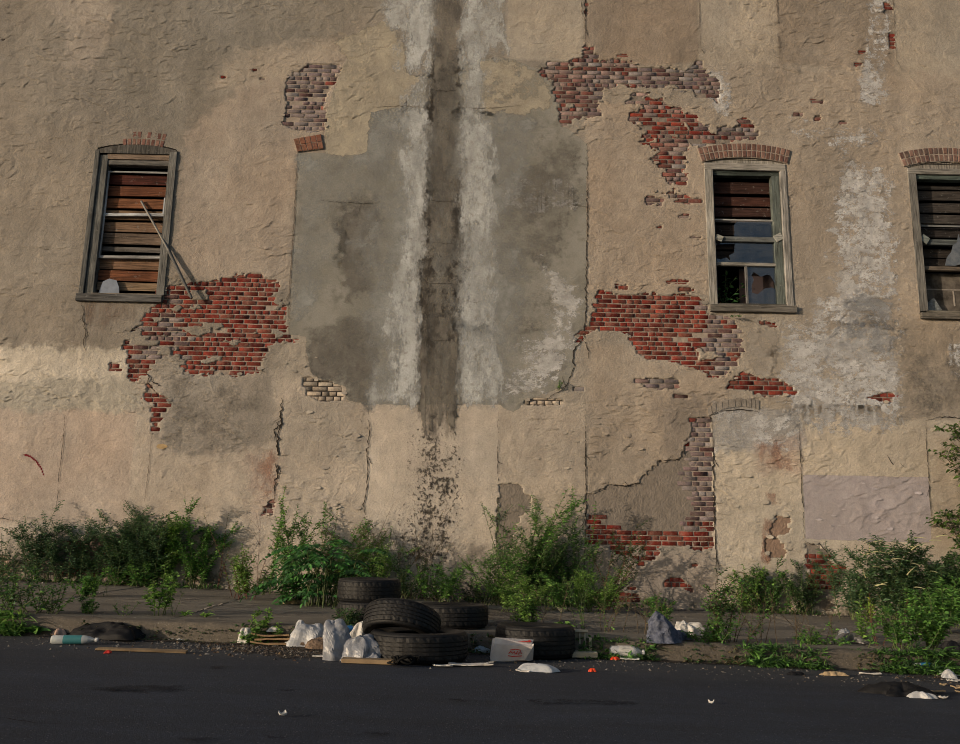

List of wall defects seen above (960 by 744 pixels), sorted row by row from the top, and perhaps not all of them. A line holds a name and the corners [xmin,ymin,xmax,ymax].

spalling [281,64,342,133]
spalling [538,45,759,220]
spalling [109,273,299,434]
leakage [308,0,587,626]
spalling [574,279,797,399]
leakage [714,117,907,451]
crack [273,398,283,501]
spalling [583,417,716,566]
spalling [663,576,693,593]